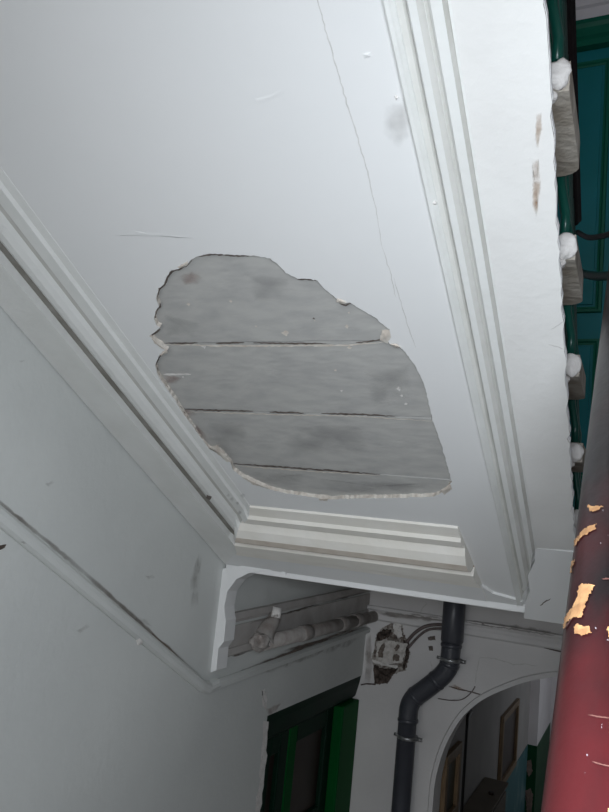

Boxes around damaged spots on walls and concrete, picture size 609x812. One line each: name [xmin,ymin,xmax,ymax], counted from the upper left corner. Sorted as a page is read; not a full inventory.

crack [317,0,416,347]
flaking render [151,254,452,501]
flaking render [570,443,584,468]
peeling [574,524,596,546]
peeling [563,583,595,636]
flaking render [371,623,411,685]